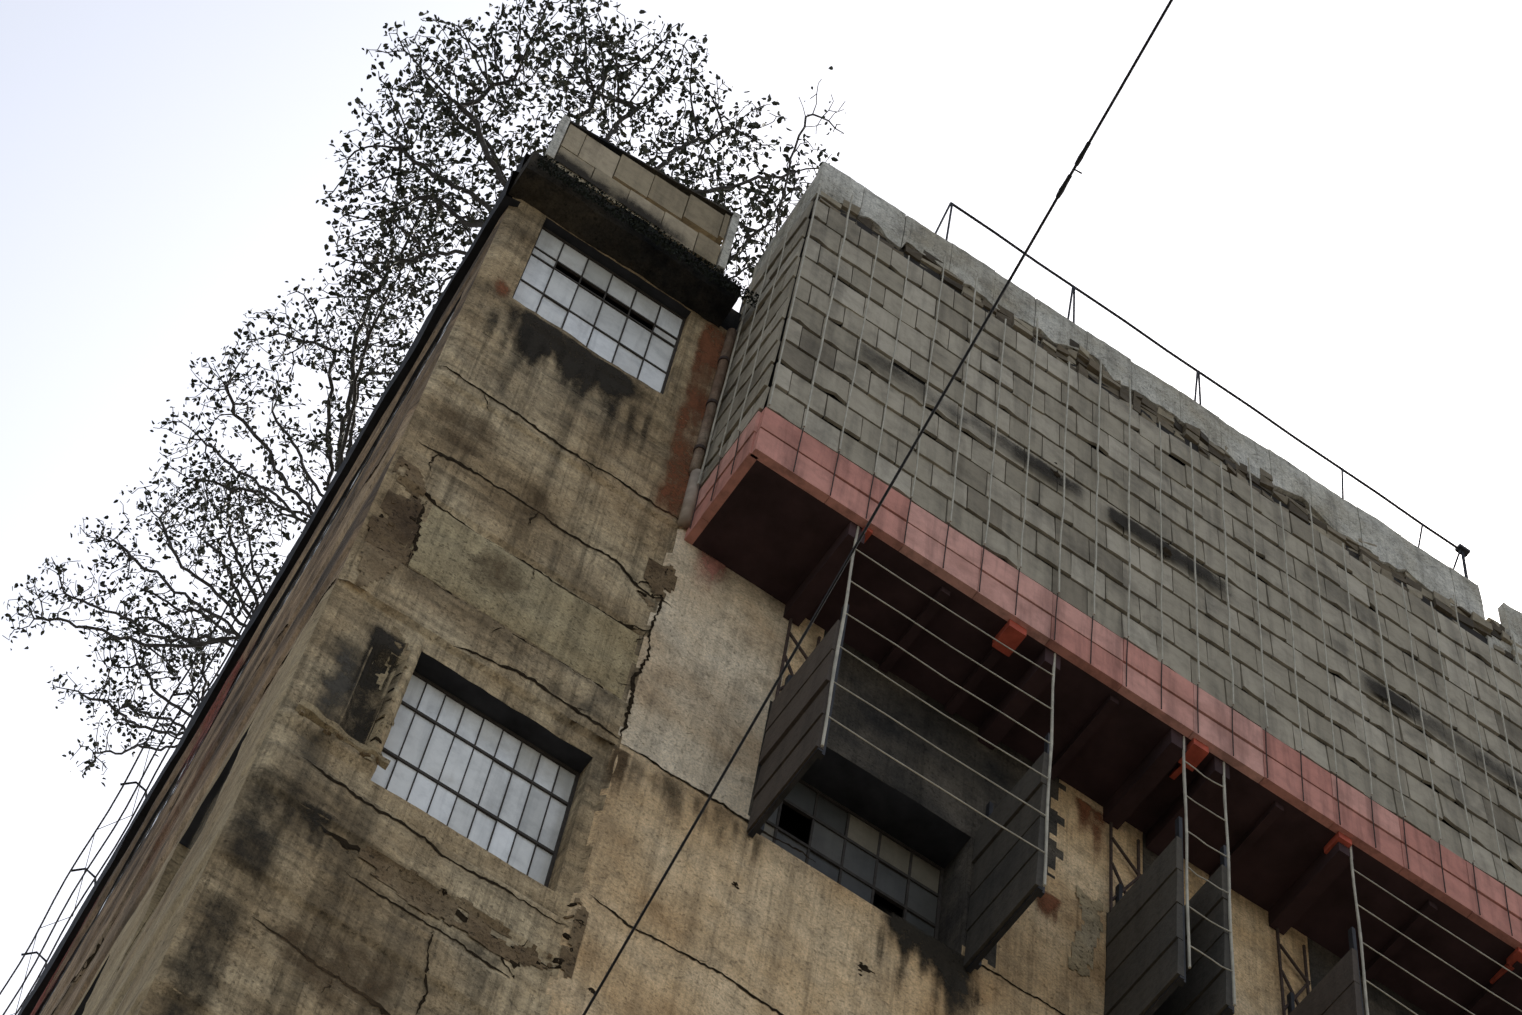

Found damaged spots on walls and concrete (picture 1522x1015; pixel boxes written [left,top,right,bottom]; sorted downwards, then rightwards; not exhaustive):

water stain [487,307,649,434]
crack [445,366,678,519]
spalling [353,456,427,591]
spalling [295,626,411,770]
crack [340,426,815,862]
water stain [168,900,237,1015]
water stain [232,769,333,876]
crack [253,758,569,1015]
spalling [358,846,589,978]
crack [591,895,784,1015]
water stain [878,914,979,1015]